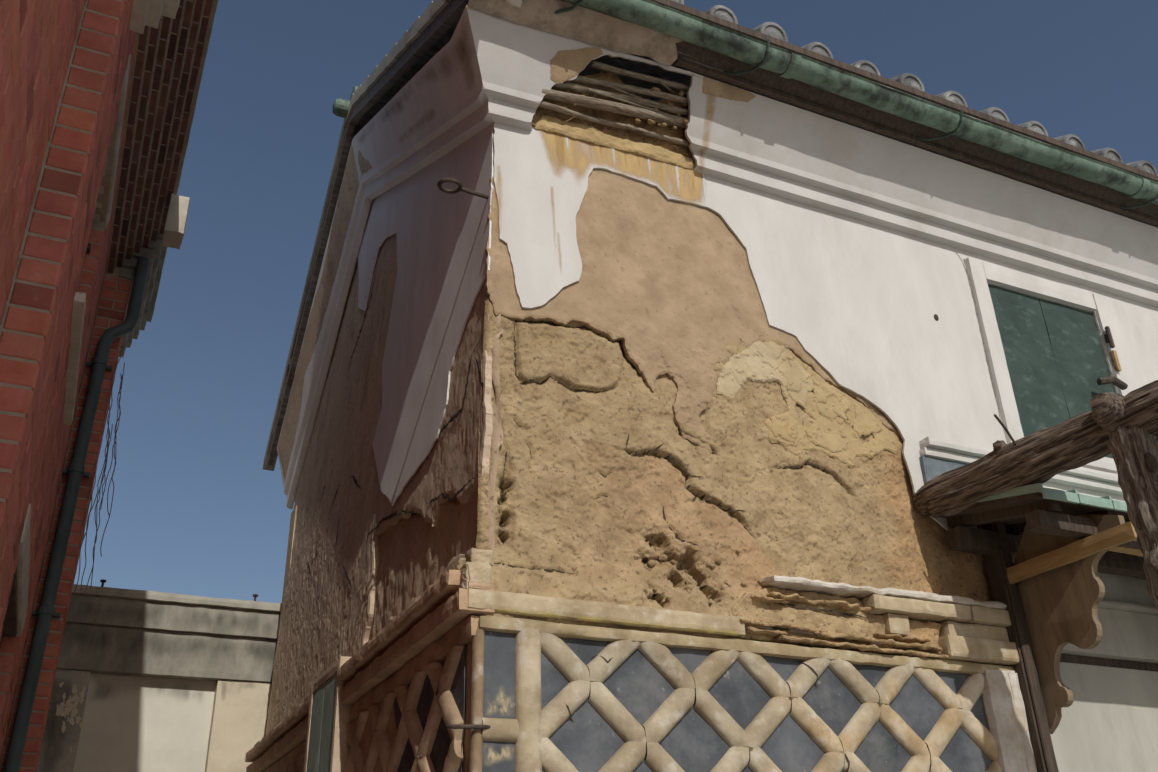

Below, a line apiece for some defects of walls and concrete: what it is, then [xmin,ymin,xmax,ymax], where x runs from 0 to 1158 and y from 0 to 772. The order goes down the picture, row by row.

spalling [531,47,756,169]
crack [514,320,642,393]
crack [307,330,532,590]
peeling [266,145,993,734]
crack [593,429,753,536]
crack [775,462,851,494]
crack [663,506,699,546]
crack [494,563,574,574]
peeling [56,674,86,733]